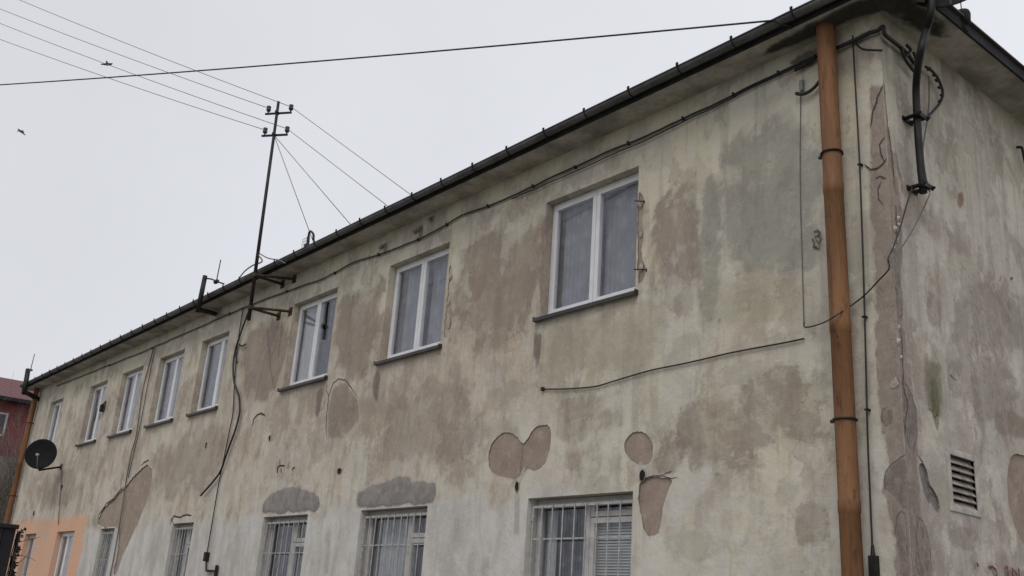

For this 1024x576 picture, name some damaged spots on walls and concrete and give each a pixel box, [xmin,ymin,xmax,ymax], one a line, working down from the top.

spalling [864,85,940,576]
flaking render [98,464,152,575]
flaking render [488,425,551,531]
flaking render [624,431,672,536]
flaking render [1007,454,1024,543]